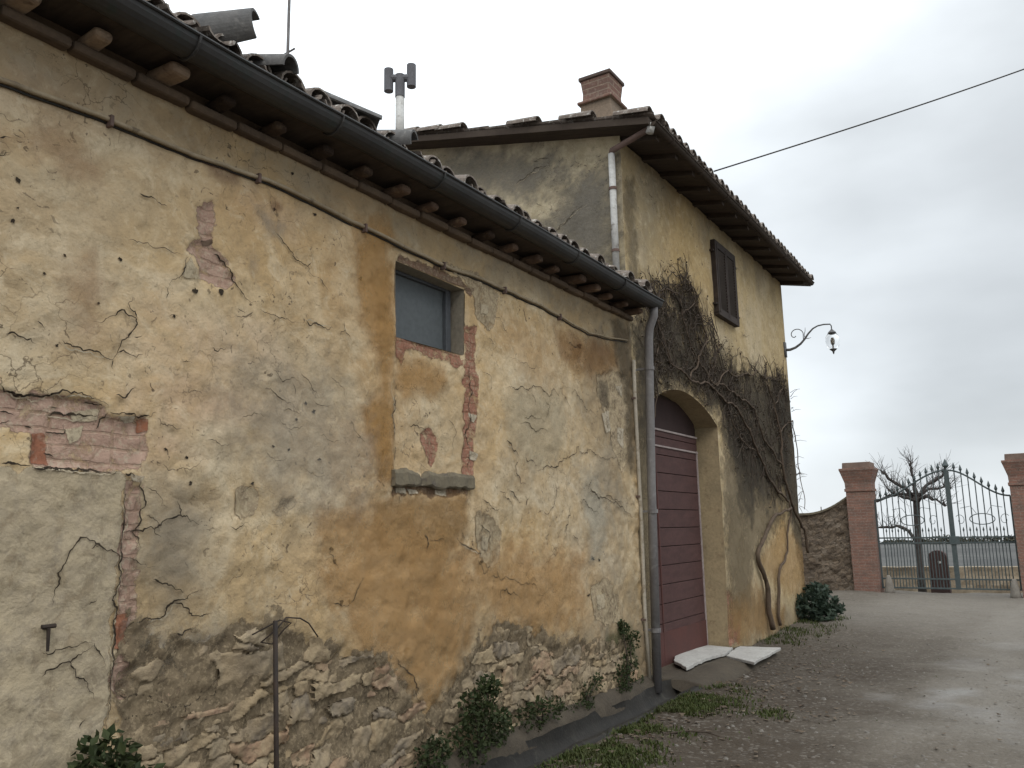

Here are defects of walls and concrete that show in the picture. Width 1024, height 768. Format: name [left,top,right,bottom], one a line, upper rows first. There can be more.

spalling [0,390,149,700]
crack [8,299,143,367]
crack [0,386,246,739]
crack [129,239,187,316]
spalling [183,202,236,295]
crack [213,253,350,336]
crack [242,370,365,442]
water stain [323,496,467,709]
spalling [395,254,499,476]
crack [426,362,634,599]